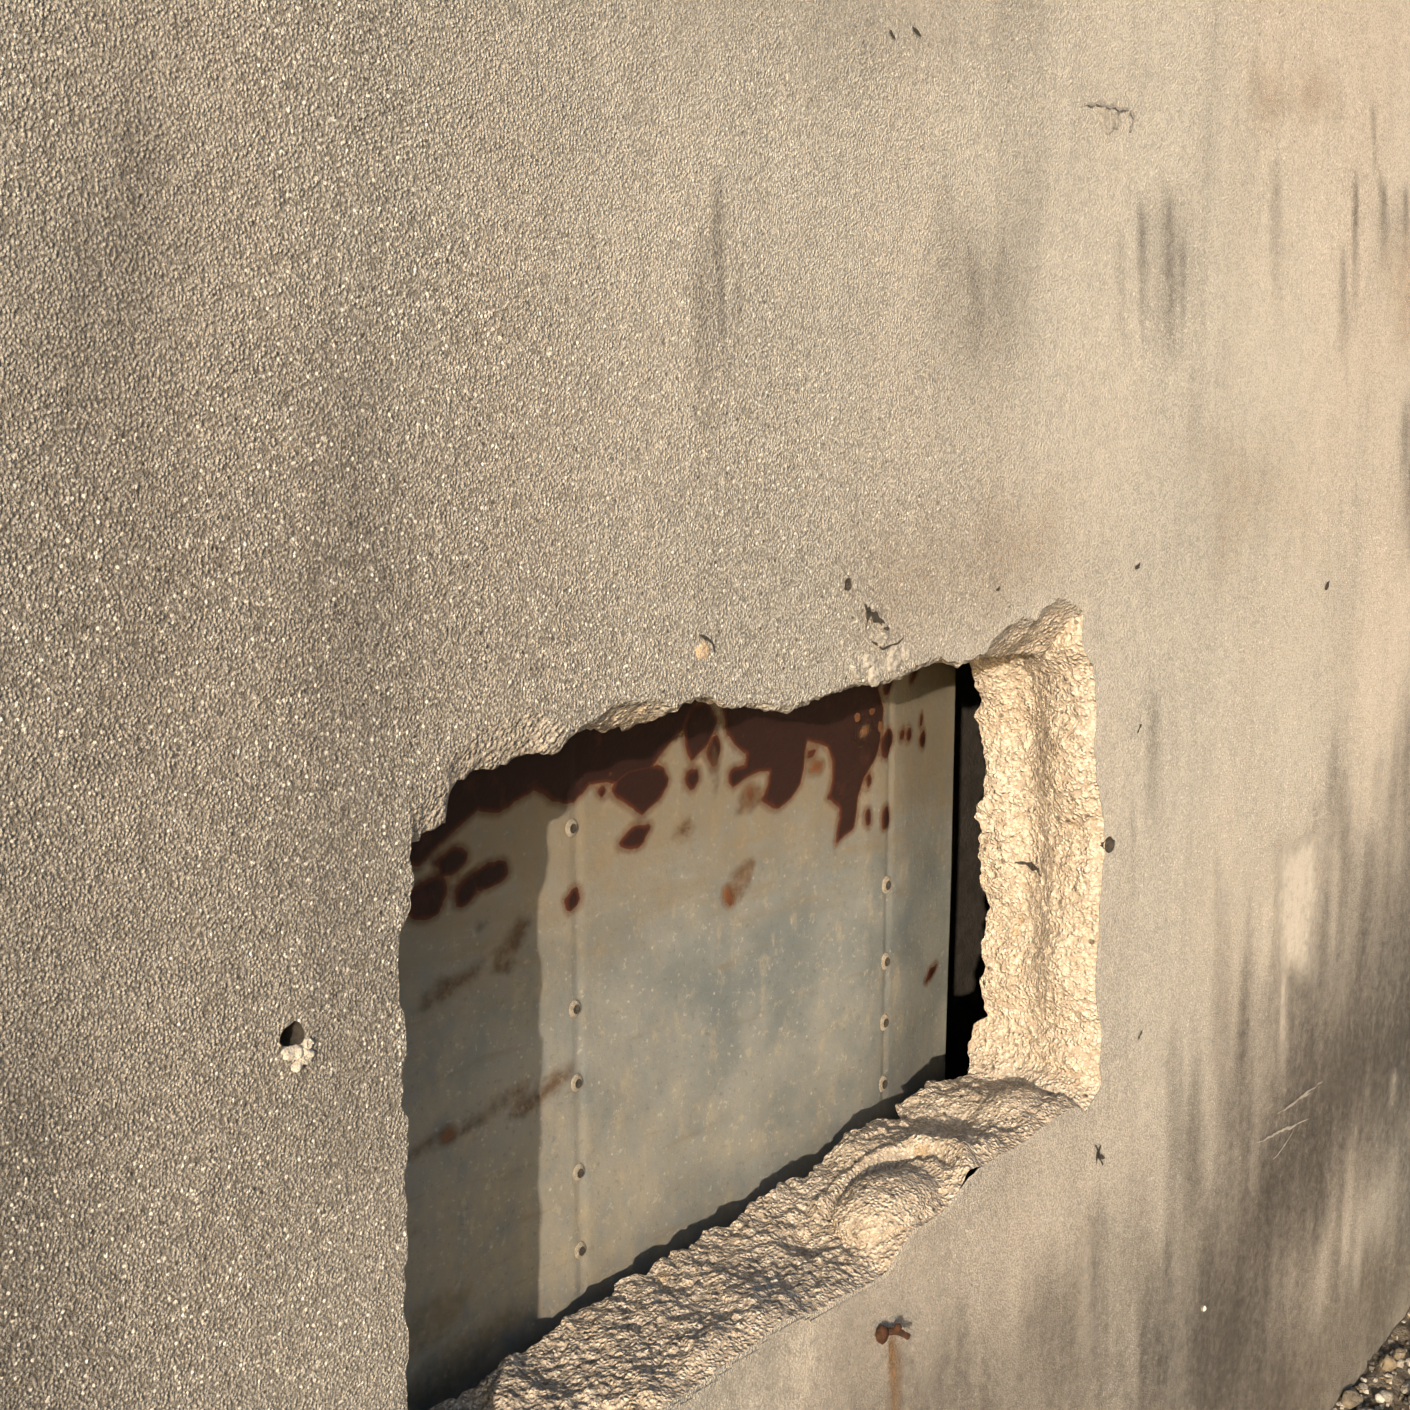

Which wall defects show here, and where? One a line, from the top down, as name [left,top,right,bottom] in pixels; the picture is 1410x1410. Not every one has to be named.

flaking render [696,634,715,660]
flaking render [849,601,910,687]
corrosion [408,681,925,920]
corrosion [518,1074,567,1114]
leakage [1153,835,1410,1410]